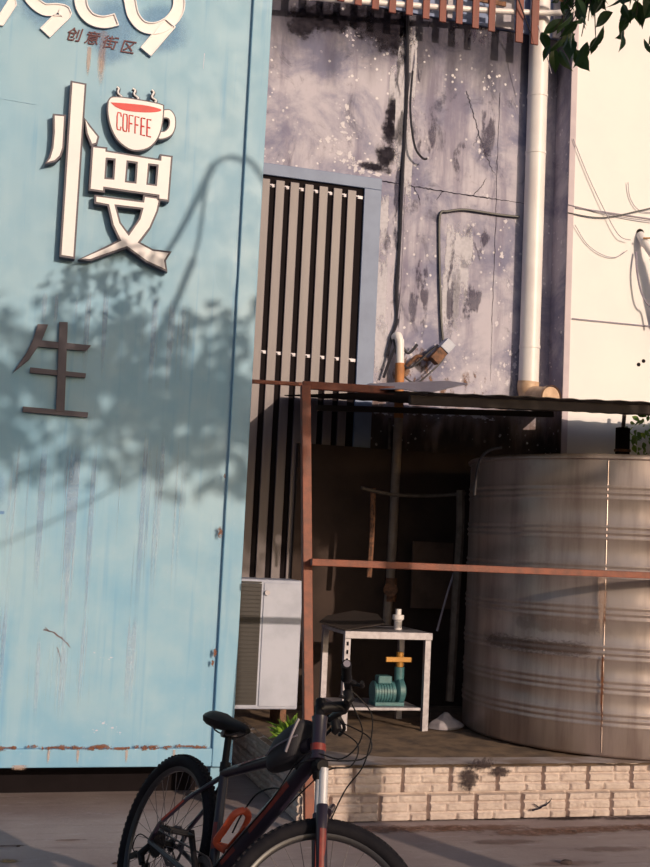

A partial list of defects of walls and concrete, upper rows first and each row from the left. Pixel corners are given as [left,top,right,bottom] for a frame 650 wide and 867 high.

peeling [320,99,383,177]
leakage [287,3,436,378]
crack [383,91,524,204]
leakage [480,113,495,155]
leakage [442,224,489,329]
corrosion [0,744,208,752]